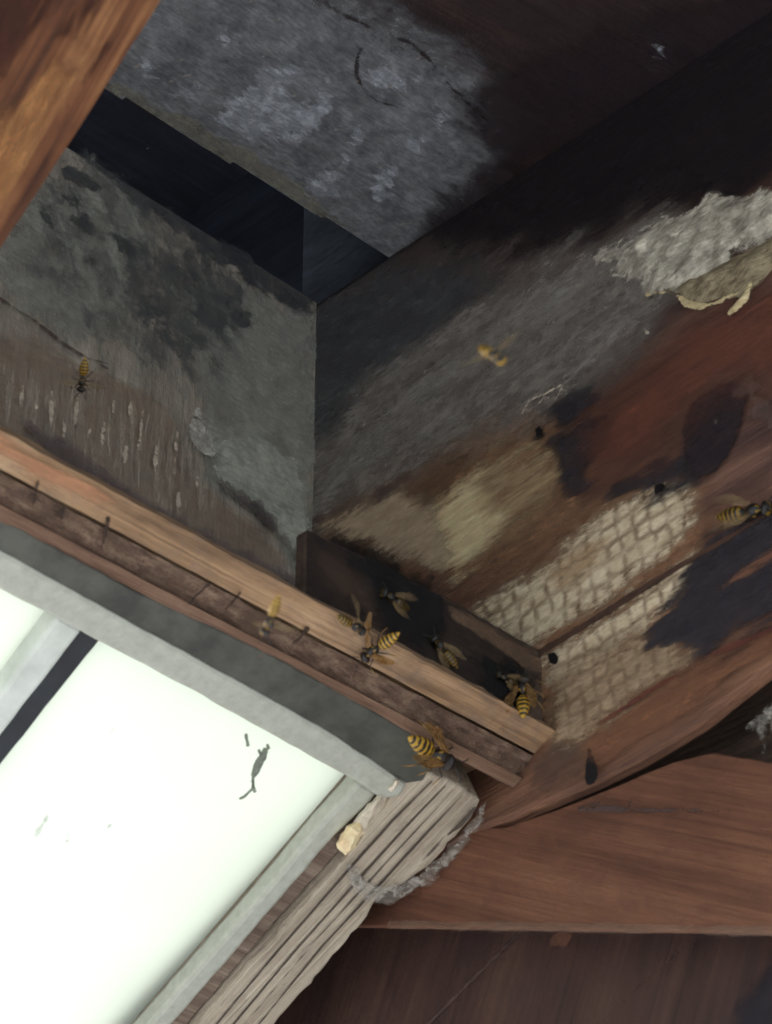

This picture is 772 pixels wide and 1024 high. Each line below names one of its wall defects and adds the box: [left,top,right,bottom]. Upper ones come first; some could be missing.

leakage [0,0,772,781]